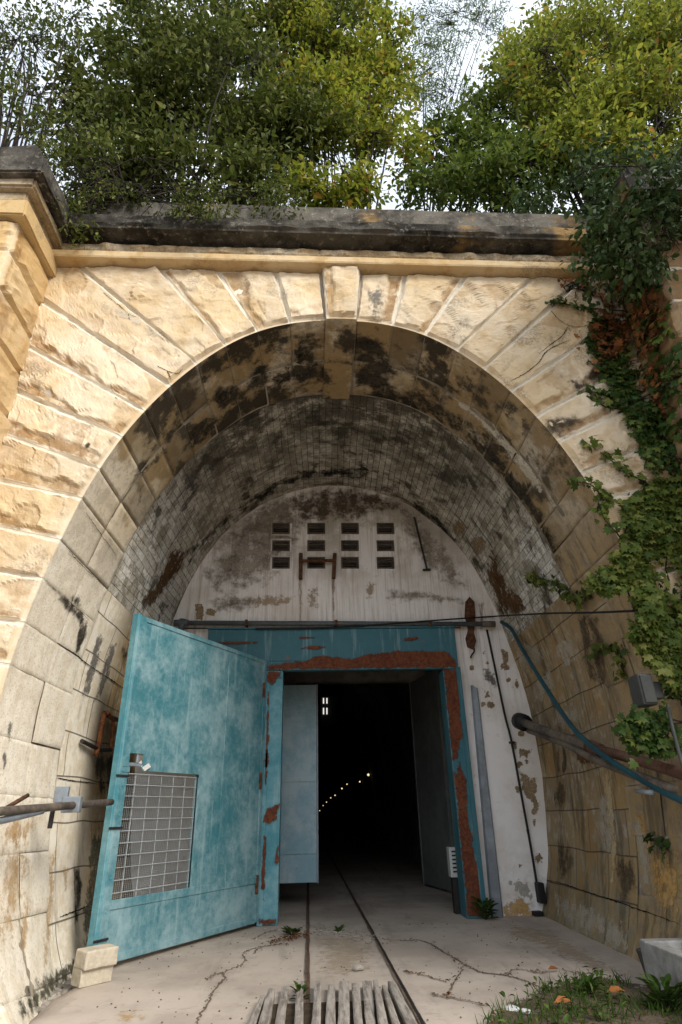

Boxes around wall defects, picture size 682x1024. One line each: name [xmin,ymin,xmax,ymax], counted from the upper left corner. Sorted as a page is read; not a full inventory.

damp [166,334,322,447]
crack [513,310,586,380]
damp [355,337,560,563]
damp [187,465,462,610]
corrosion [487,551,526,618]
damp [60,597,127,701]
corrosion [263,637,482,917]
peeling [513,730,539,831]
corrosion [261,836,279,890]
crack [196,928,293,1024]
crack [382,938,580,1006]